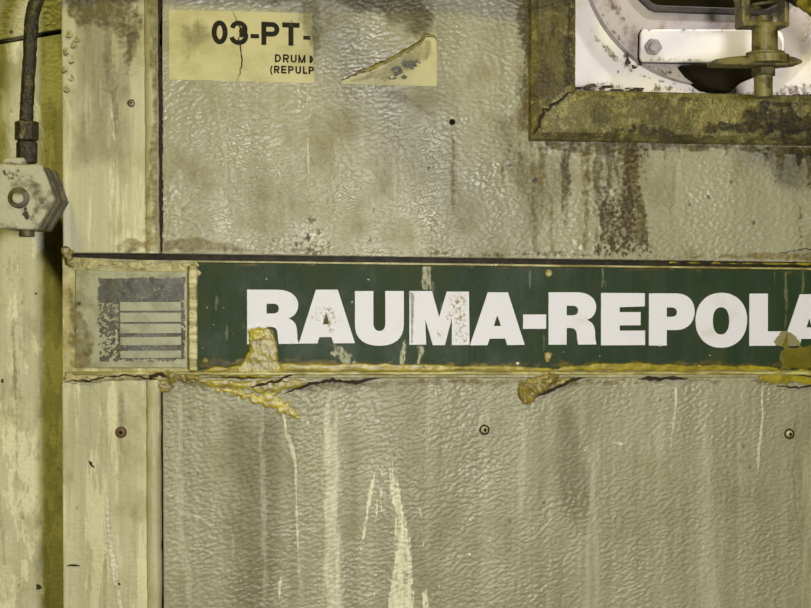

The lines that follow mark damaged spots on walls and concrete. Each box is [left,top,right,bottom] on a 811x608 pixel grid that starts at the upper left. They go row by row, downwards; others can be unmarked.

crack [233,13,243,80]
crack [533,91,575,135]
water stain [360,451,428,608]